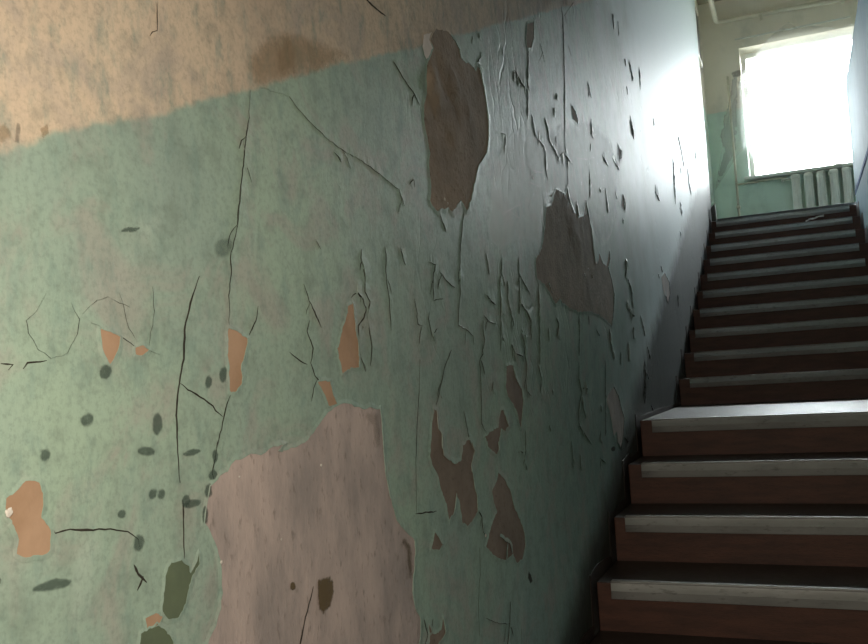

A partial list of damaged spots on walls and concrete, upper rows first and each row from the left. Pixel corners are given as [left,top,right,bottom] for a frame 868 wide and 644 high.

peeling [0,476,56,563]
crack [54,528,136,538]
peeling [136,548,203,644]
crack [175,276,234,559]
crack [291,282,323,402]
crack [228,85,416,325]
peeling [200,249,448,644]
peeling [421,25,491,231]
peeling [428,343,527,566]
peeling [535,185,615,329]